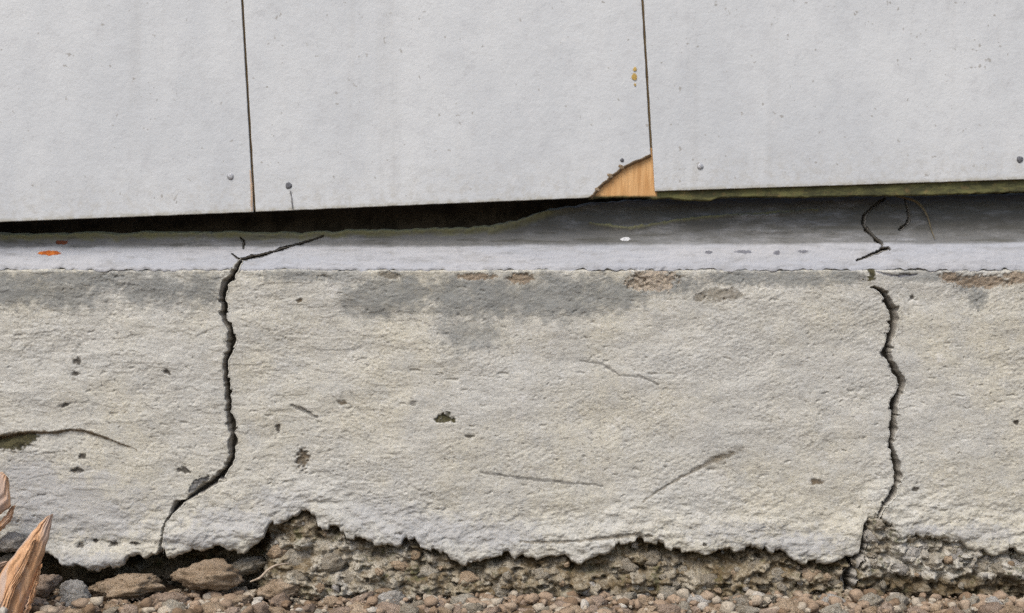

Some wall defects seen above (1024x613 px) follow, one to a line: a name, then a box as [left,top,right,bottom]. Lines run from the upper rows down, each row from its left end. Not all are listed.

spalling [590,154,651,199]
corrosion [38,240,67,256]
leakage [353,272,646,317]
crack [159,236,323,553]
crack [840,200,917,591]
crack [0,428,137,450]
spalling [40,510,1024,604]